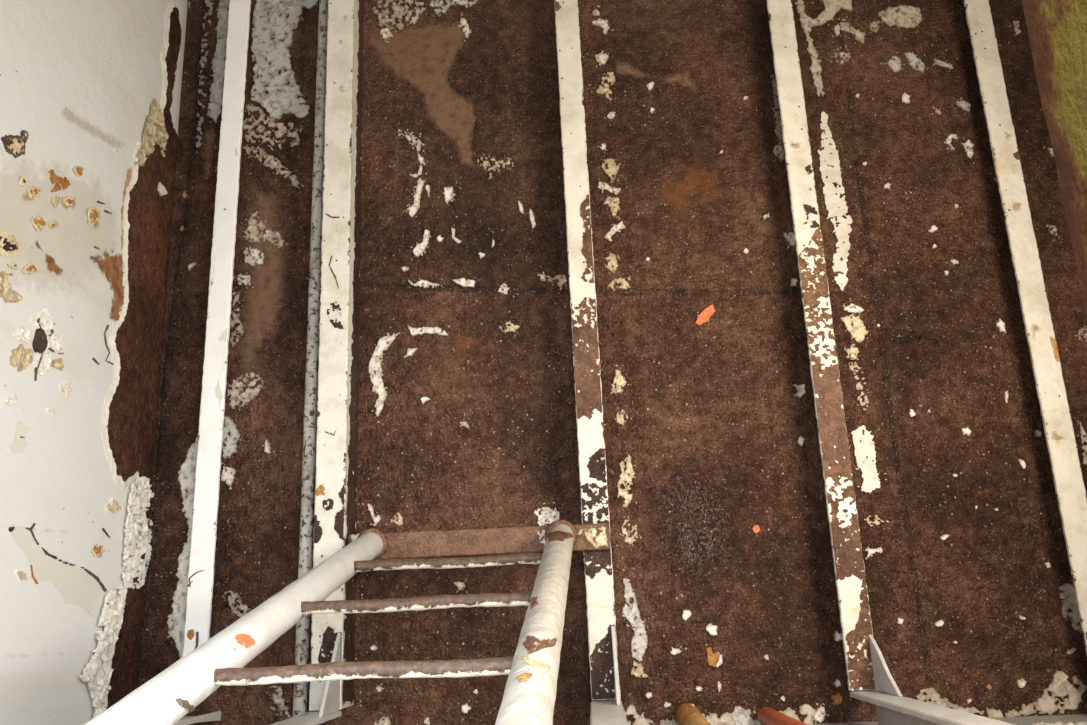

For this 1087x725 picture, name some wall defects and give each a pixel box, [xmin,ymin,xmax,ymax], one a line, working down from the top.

peeling [372,0,436,15]
peeling [1,130,29,158]
peeling [243,121,304,163]
peeling [0,271,23,303]
peeling [848,356,870,411]
corrosion [584,550,612,579]
peeling [9,476,154,718]
corrosion [345,574,356,600]
corrosion [318,613,355,663]
corrosion [342,679,354,705]